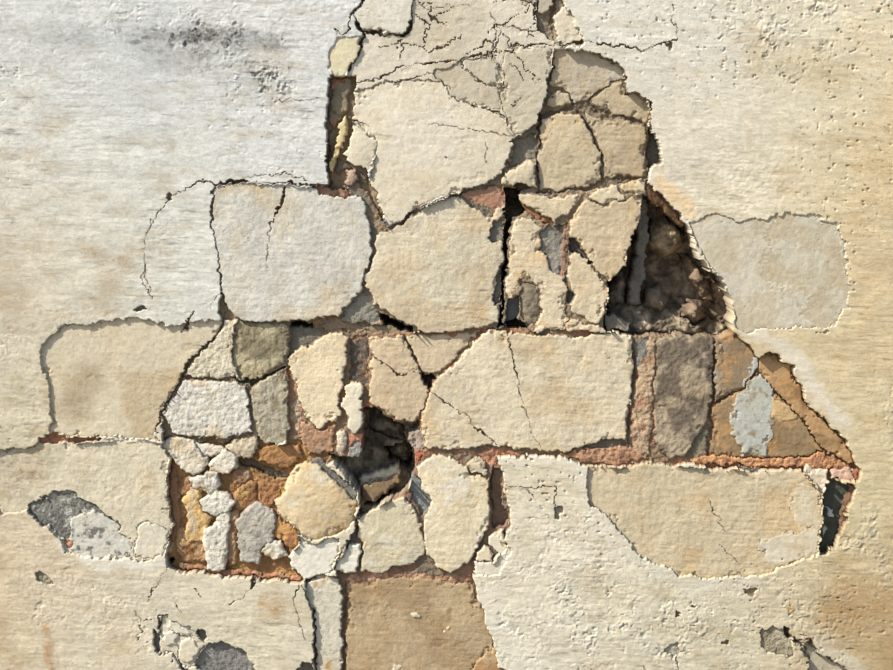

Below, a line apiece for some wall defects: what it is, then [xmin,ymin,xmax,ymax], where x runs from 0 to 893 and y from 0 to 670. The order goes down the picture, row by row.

crack [140,129,351,446]
spalling [0,0,661,670]
crack [334,507,363,670]
crack [334,0,679,290]
crack [563,225,572,330]
spalling [287,316,859,670]
crack [626,338,638,445]
peeling [640,212,854,333]